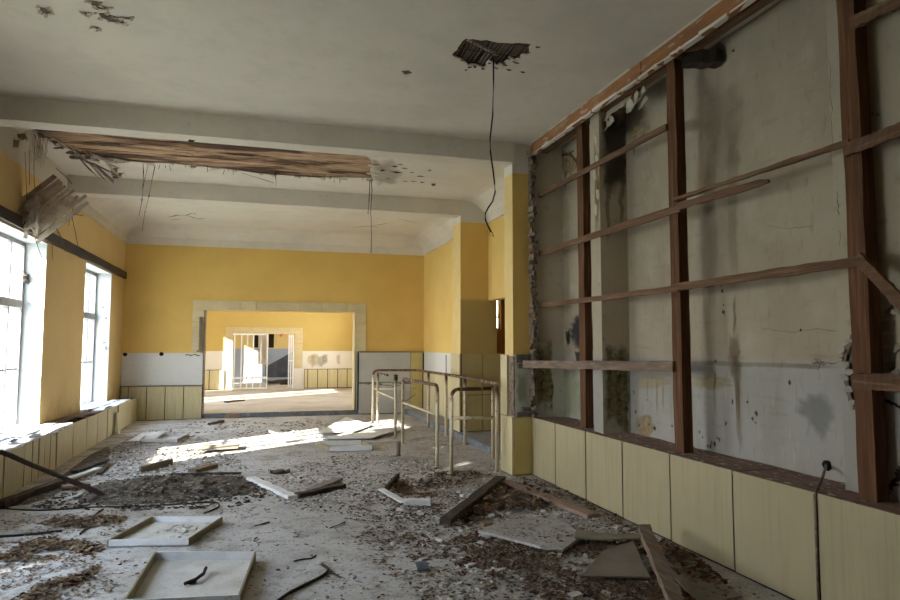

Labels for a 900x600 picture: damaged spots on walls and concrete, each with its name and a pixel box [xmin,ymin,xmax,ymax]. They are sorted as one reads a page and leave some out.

flaking render [35,5,54,18]
flaking render [78,0,134,32]
flaking render [454,39,540,73]
flaking render [12,129,380,183]
spalling [509,150,539,418]
damp [536,342,553,407]
damp [605,348,653,436]
spalling [837,319,855,410]